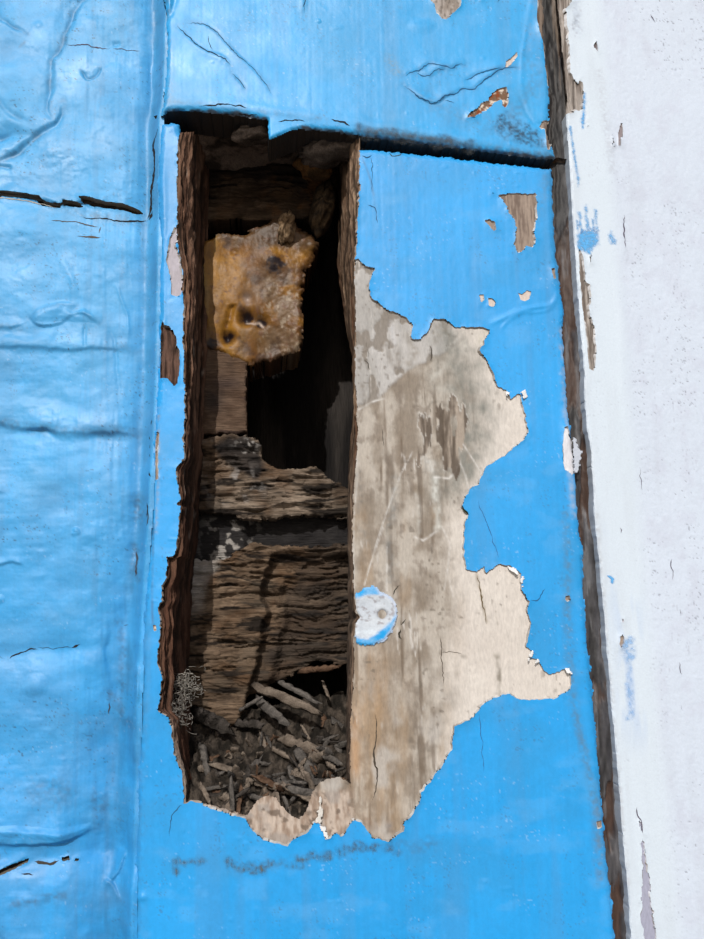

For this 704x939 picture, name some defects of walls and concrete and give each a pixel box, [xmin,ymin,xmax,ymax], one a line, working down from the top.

peeling [431,0,461,19]
peeling [537,0,548,85]
peeling [557,0,584,115]
crack [0,129,158,238]
peeling [539,120,551,150]
peeling [578,249,597,371]
spalling [153,132,209,803]
peeling [203,138,573,846]
crack [0,856,79,875]